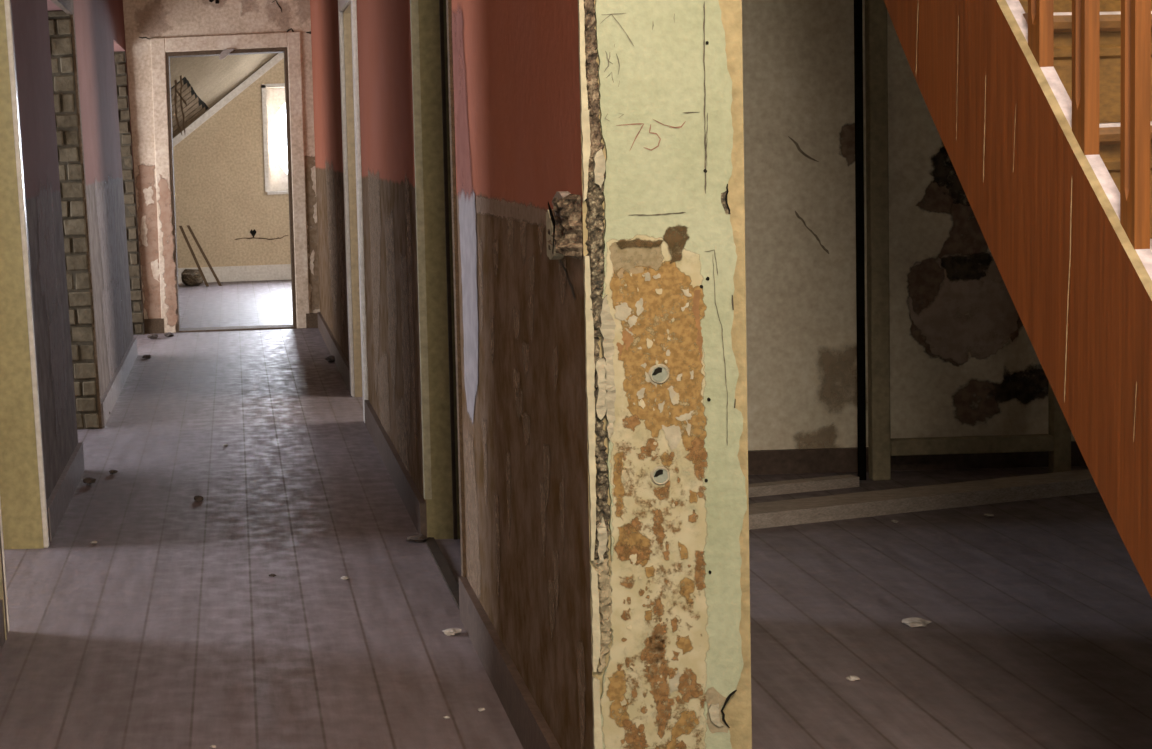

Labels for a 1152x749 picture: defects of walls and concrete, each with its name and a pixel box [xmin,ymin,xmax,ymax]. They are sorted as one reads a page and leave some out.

flaking render [114,51,178,335]
flaking render [452,0,747,749]